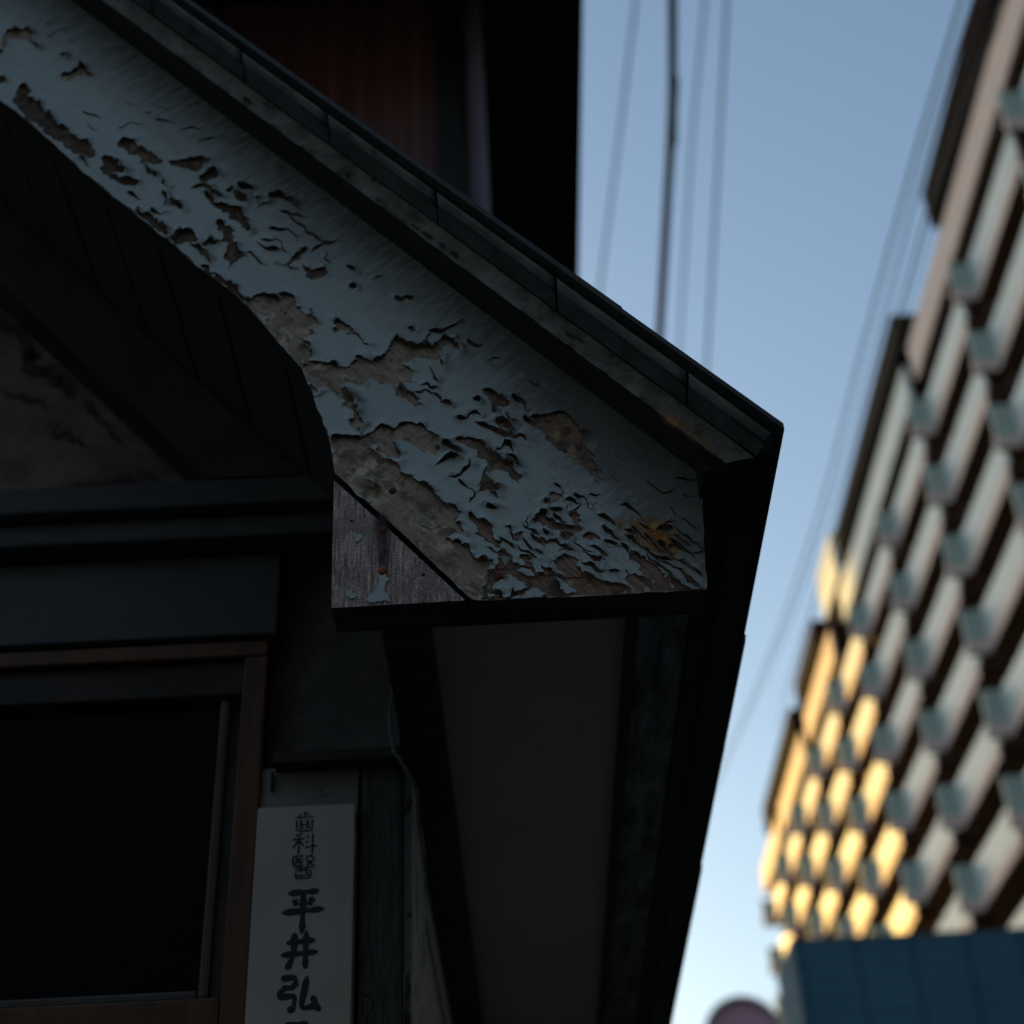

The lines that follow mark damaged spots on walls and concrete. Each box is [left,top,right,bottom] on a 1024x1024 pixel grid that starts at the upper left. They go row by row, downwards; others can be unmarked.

peeling [0,74,707,603]